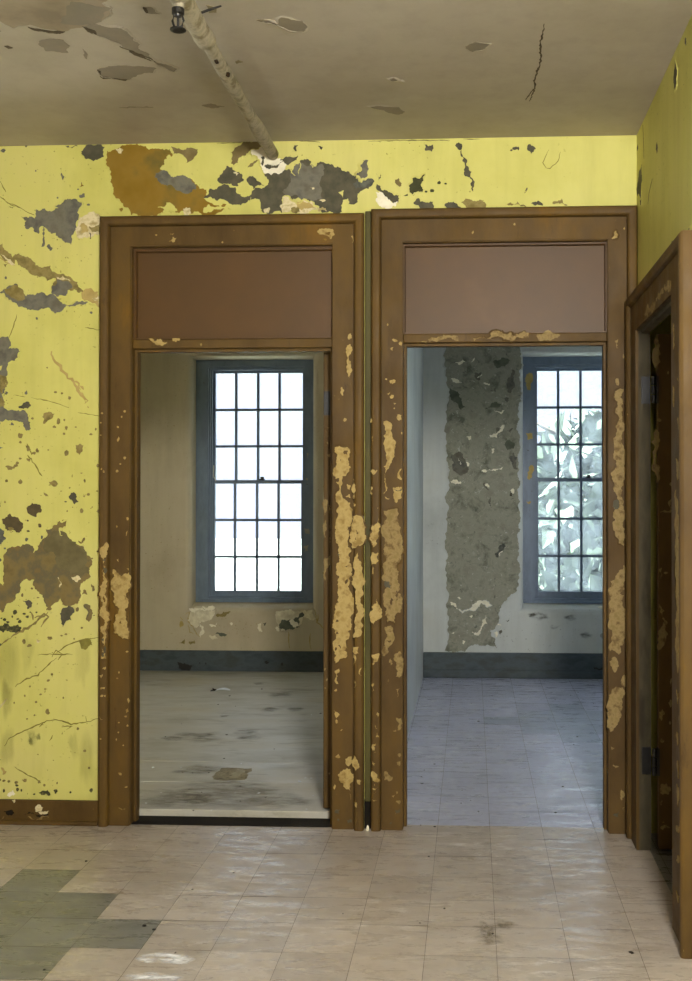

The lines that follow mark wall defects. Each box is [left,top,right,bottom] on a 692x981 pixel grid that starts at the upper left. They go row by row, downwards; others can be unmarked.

peeling [0,0,180,81]
crack [526,25,545,101]
peeling [22,182,102,251]
peeling [66,142,486,216]
peeling [0,244,100,320]
peeling [340,334,354,396]
peeling [0,336,77,484]
peeling [422,329,560,652]
peeling [609,378,626,548]
peeling [0,473,132,697]
peeling [598,566,626,732]
crack [4,716,98,746]